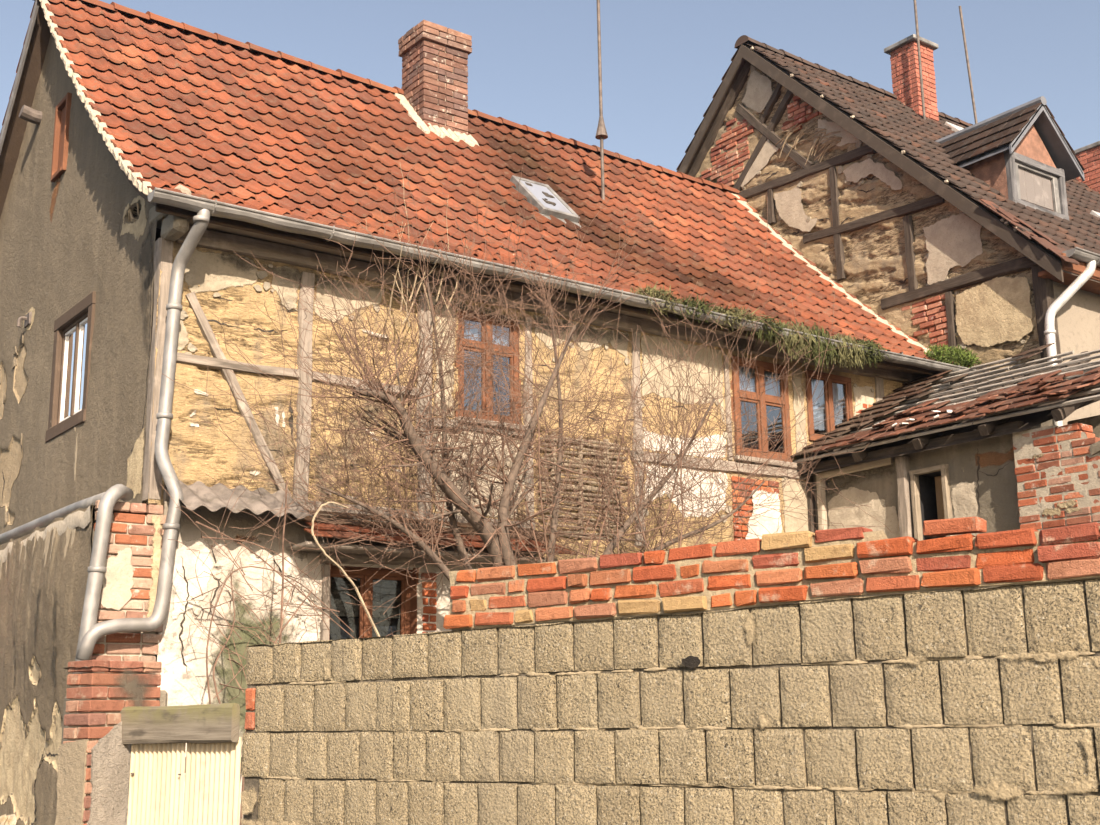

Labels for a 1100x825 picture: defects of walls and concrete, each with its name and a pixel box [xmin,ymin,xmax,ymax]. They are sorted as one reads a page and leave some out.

flaking render [701,65,780,190]
peeling [782,96,902,190]
spalling [120,195,147,241]
peeling [774,181,818,232]
peeling [902,210,1033,354]
peeling [0,307,35,420]
peeling [0,433,23,525]
peeling [828,487,900,539]
peeling [100,547,135,611]
crack [179,549,232,674]
peeling [29,656,41,685]
peeling [0,696,63,825]